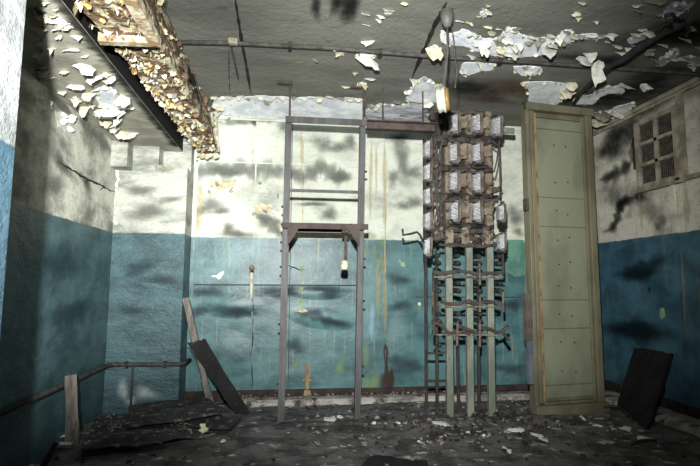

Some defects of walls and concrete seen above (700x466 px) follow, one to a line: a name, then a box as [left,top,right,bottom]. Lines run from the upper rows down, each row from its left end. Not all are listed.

water stain [333,0,357,15]
peeling [629,0,696,21]
peeling [29,0,138,140]
peeling [89,0,446,160]
peeling [425,4,700,127]
water stain [599,142,622,157]
crack [59,162,115,192]
peeling [208,179,237,193]
peeling [252,182,279,216]
crack [248,299,256,390]
rust [382,344,394,387]